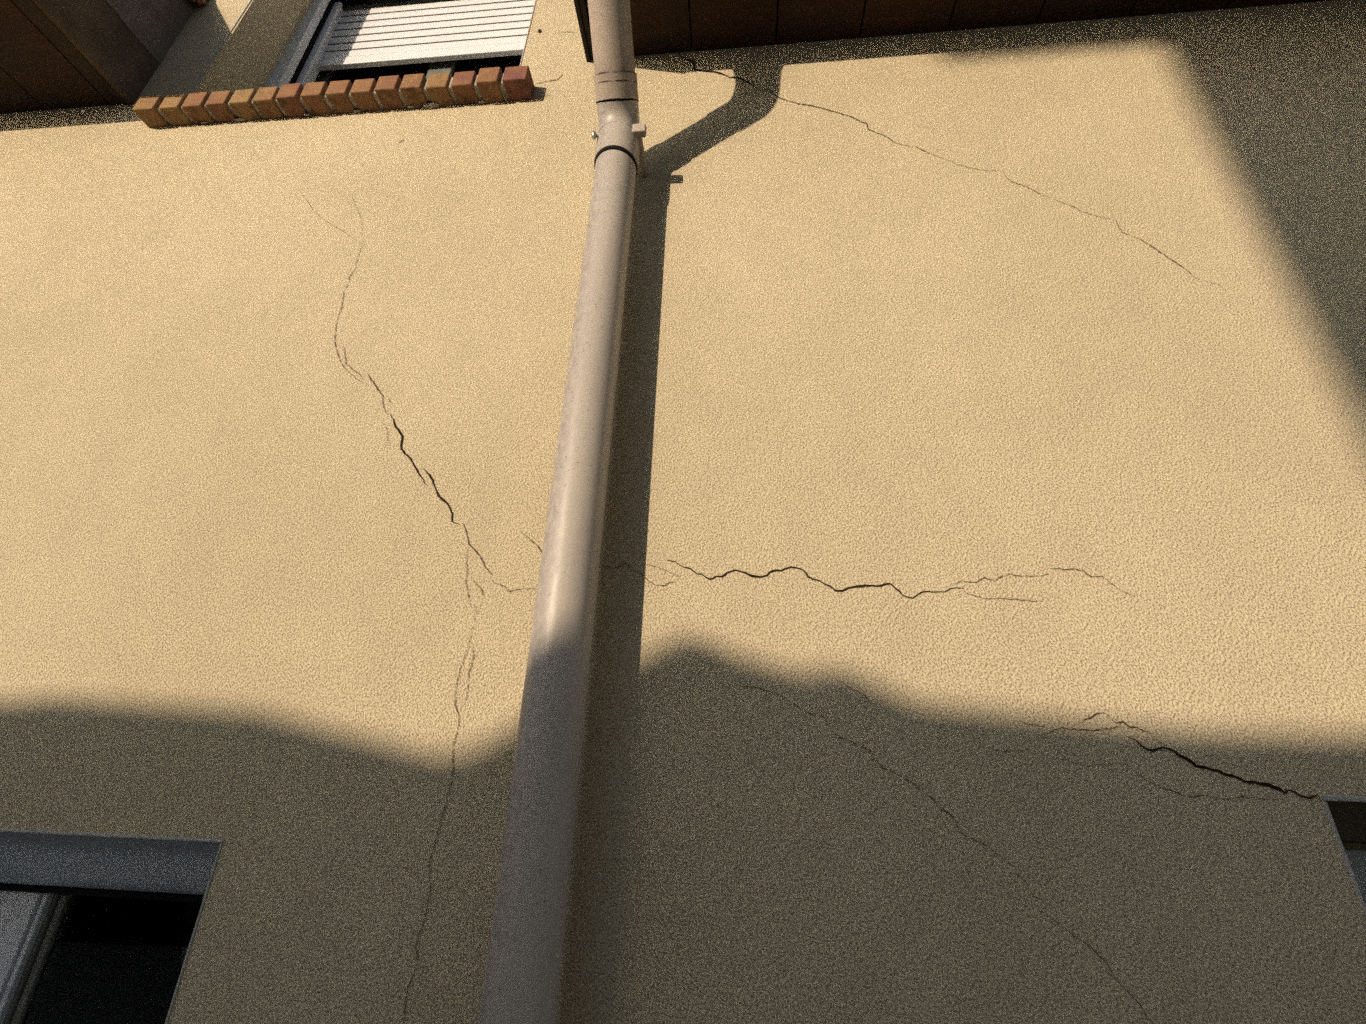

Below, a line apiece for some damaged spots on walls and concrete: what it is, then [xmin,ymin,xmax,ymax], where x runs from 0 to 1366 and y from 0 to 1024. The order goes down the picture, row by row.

crack [678,52,1219,285]
crack [300,191,536,1024]
crack [599,560,1134,602]
crack [739,685,1154,1024]
crack [989,712,1322,802]